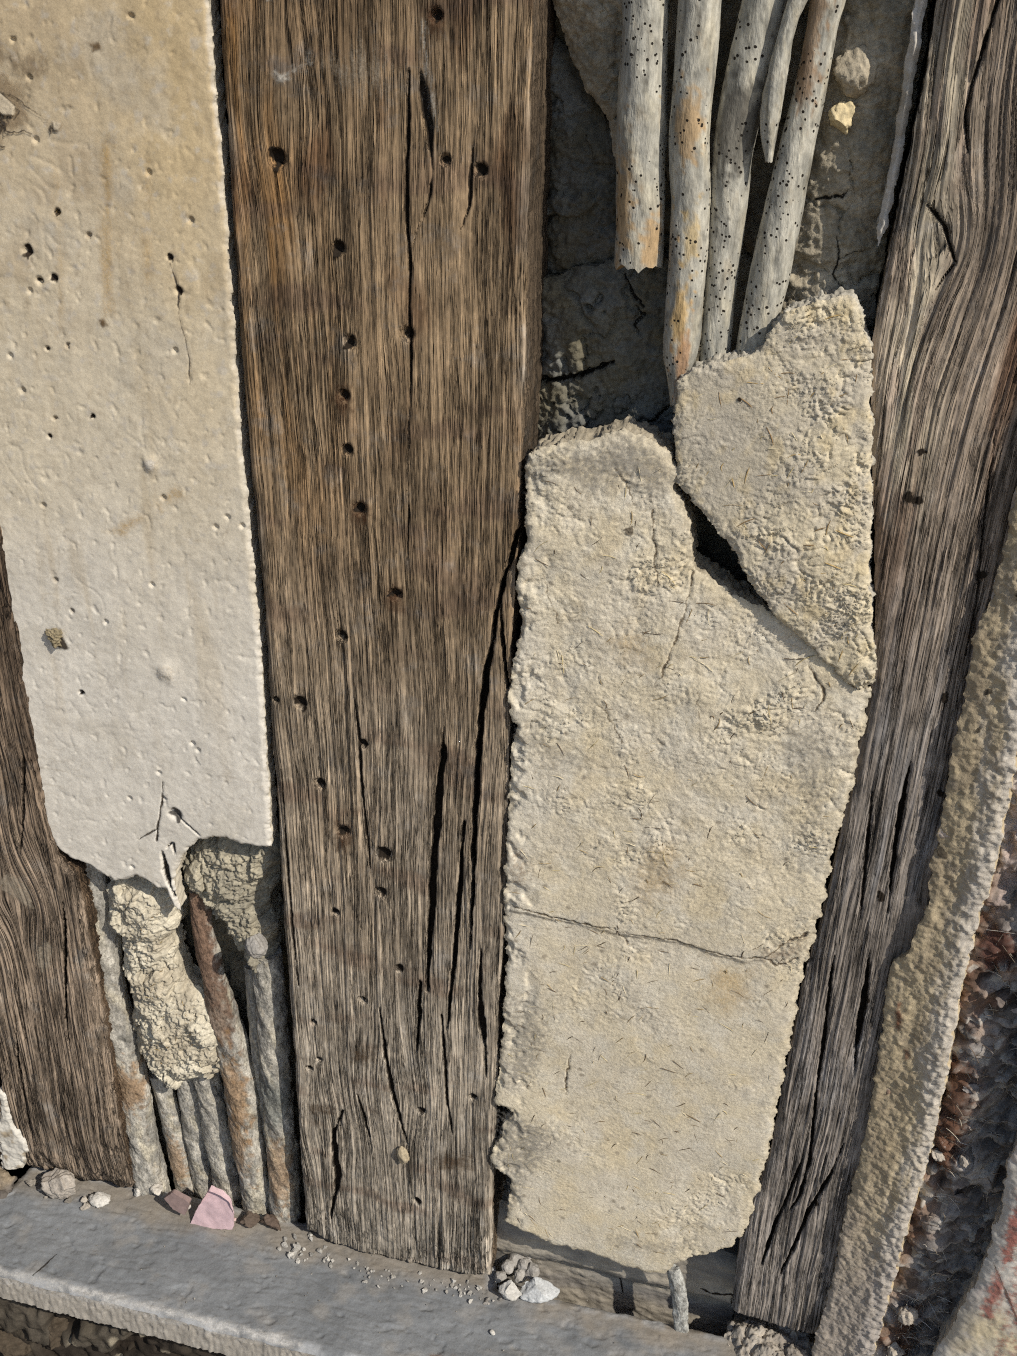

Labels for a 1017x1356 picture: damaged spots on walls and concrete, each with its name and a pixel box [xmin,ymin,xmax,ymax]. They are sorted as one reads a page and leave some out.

crack [809,667,826,711]
crack [331,523,523,1218]
crack [513,906,807,967]
crack [762,958,869,1273]